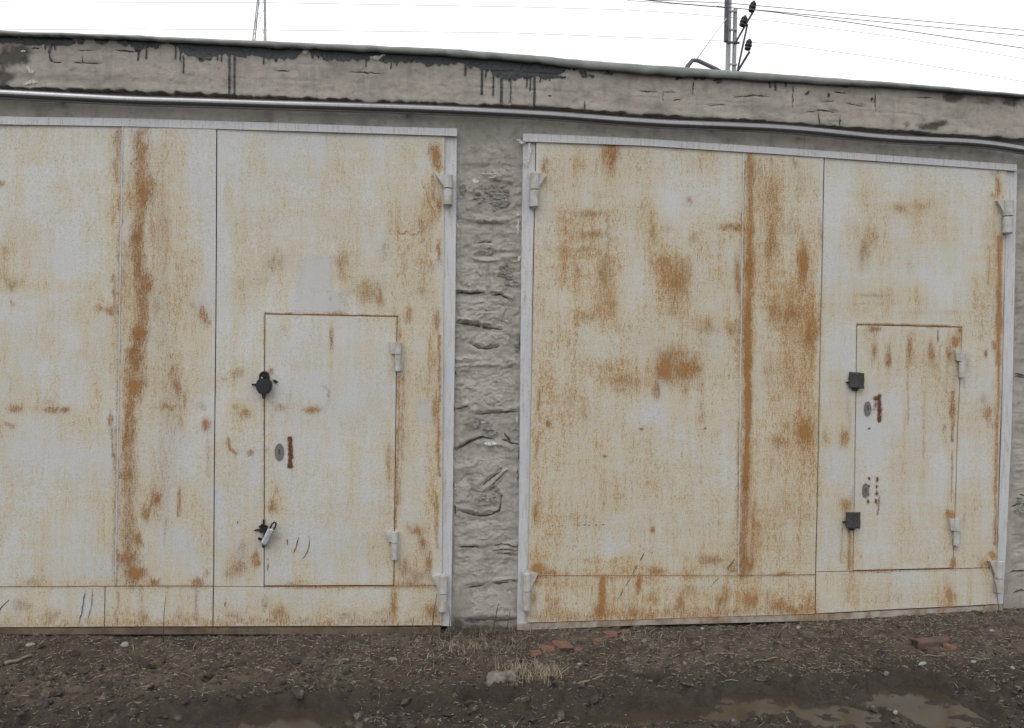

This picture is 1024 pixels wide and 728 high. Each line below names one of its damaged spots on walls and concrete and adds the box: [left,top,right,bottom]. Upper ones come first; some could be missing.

rust [423,144,441,215]
rust [797,250,808,280]
rust [265,285,411,323]
rust [107,131,160,626]
rust [428,311,441,477]
rust [652,354,700,396]
rust [700,153,762,579]
rust [868,394,882,429]
rust [857,323,962,369]
rust [985,236,1003,560]
rust [404,527,438,587]
rust [595,576,606,616]